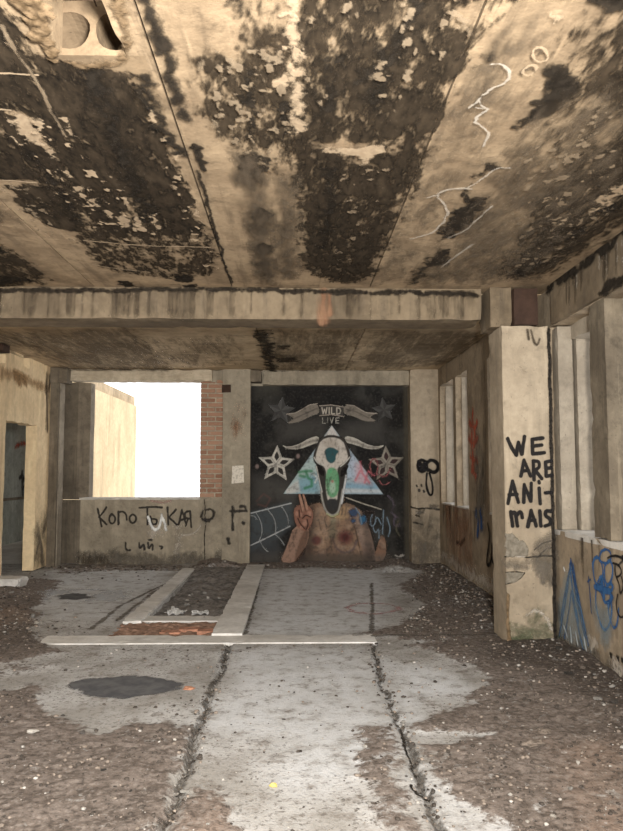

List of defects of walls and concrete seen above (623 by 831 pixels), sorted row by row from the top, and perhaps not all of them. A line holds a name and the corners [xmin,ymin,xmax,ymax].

leakage [0,0,623,298]
leakage [253,330,299,372]
crack [157,583,260,831]
crack [352,583,493,831]